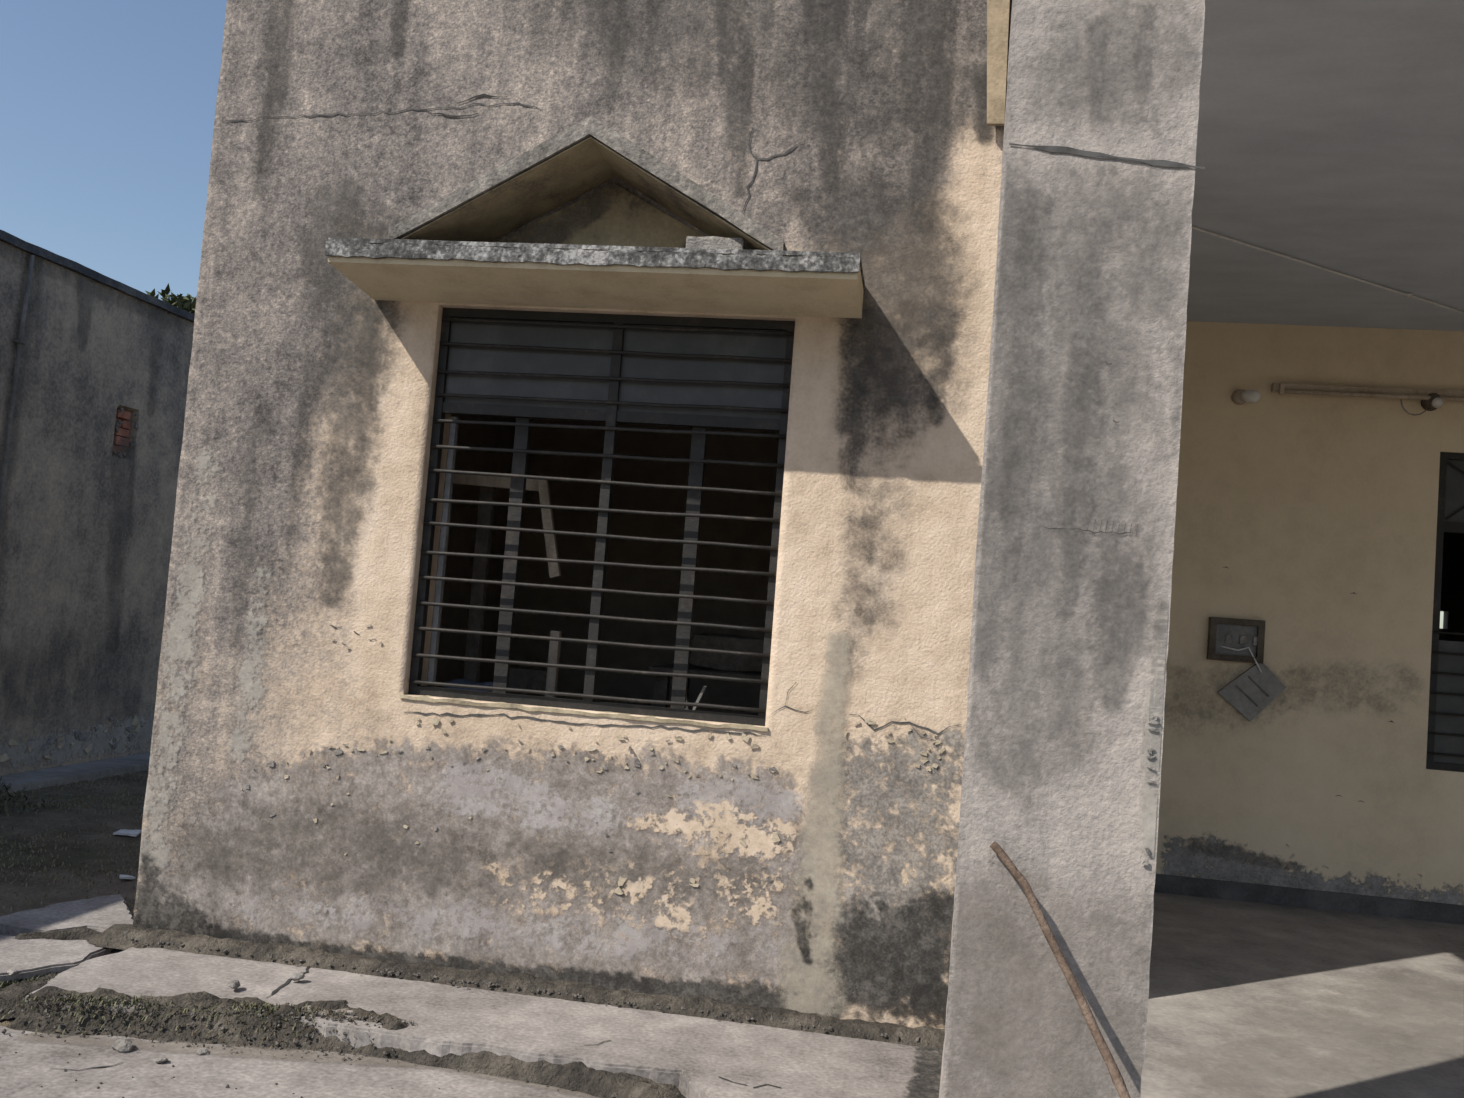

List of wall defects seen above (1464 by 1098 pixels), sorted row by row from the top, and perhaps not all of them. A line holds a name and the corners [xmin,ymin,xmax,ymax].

crack [221,94,541,122]
crack [741,127,806,213]
crack [1009,143,1205,169]
water stain [789,184,962,461]
water stain [305,188,395,603]
spalling [112,408,139,458]
crack [772,684,958,744]
peeling [1139,600,1464,905]
peeling [154,712,965,998]
crack [266,966,310,998]
crack [50,1062,122,1070]